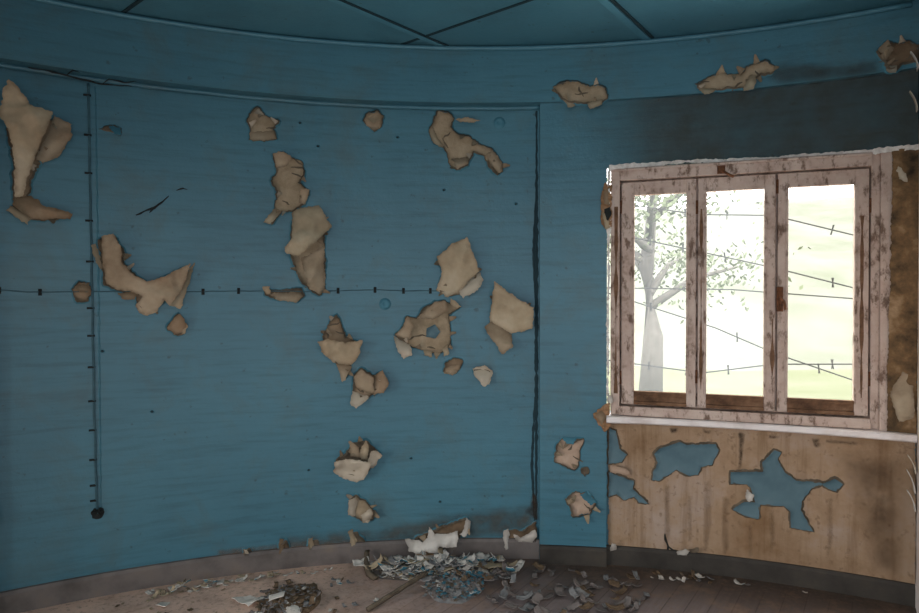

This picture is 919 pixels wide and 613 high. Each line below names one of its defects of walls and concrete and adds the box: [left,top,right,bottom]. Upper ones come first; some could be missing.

peeling [552,78,609,109]
peeling [693,54,779,95]
peeling [0,79,73,225]
peeling [427,110,510,177]
peeling [245,105,332,303]
peeling [71,234,195,337]
peeling [318,313,389,408]
peeling [394,237,493,387]
peeling [485,281,534,354]
peeling [564,144,919,584]
peeling [333,436,382,482]
peeling [553,437,590,477]